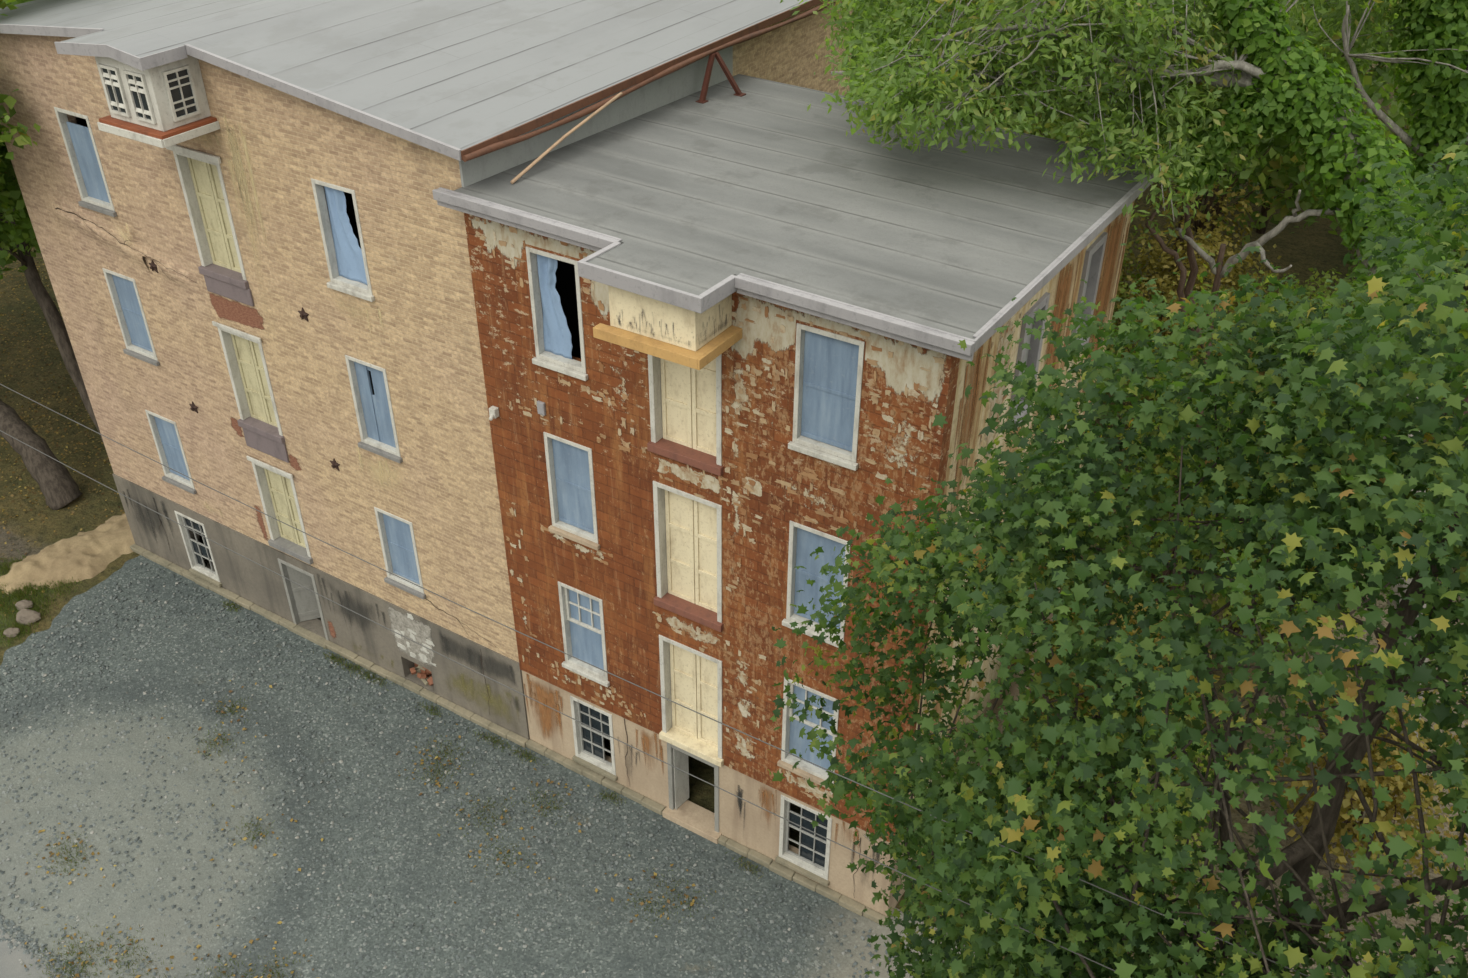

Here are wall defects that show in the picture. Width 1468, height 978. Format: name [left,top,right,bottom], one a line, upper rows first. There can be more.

peeling [468,215,610,316]
peeling [509,398,583,424]
peeling [558,295,946,592]
leakage [318,578,385,626]
peeling [388,607,436,666]
leakage [441,636,517,704]
peeling [506,502,646,723]
peeling [652,612,777,769]
peeling [771,768,841,806]